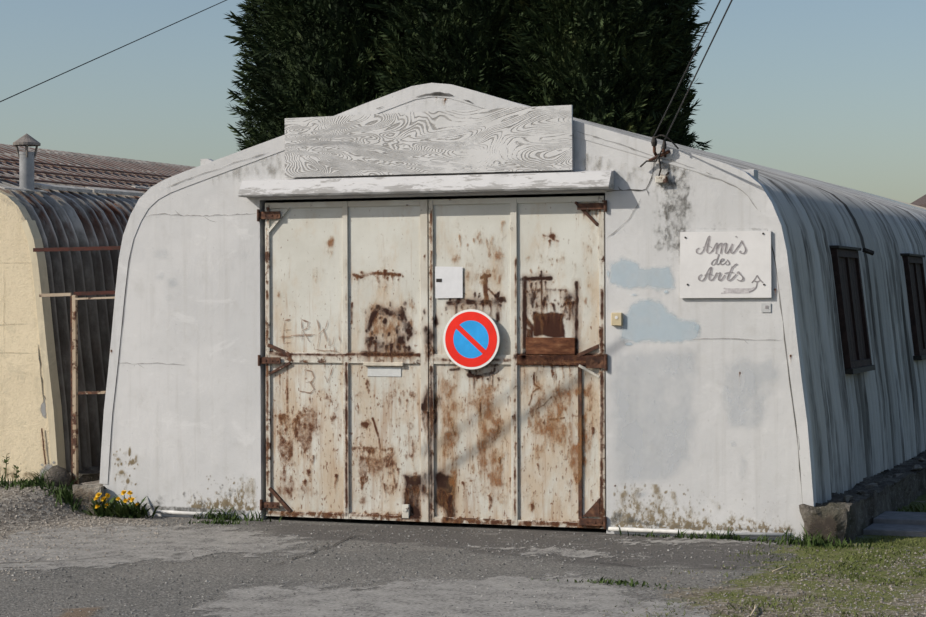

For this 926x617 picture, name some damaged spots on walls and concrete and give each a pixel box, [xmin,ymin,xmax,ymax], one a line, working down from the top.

damp [660,166,690,239]
peeling [607,260,672,293]
peeling [623,301,699,345]
corrosion [266,259,604,527]
damp [611,483,790,533]